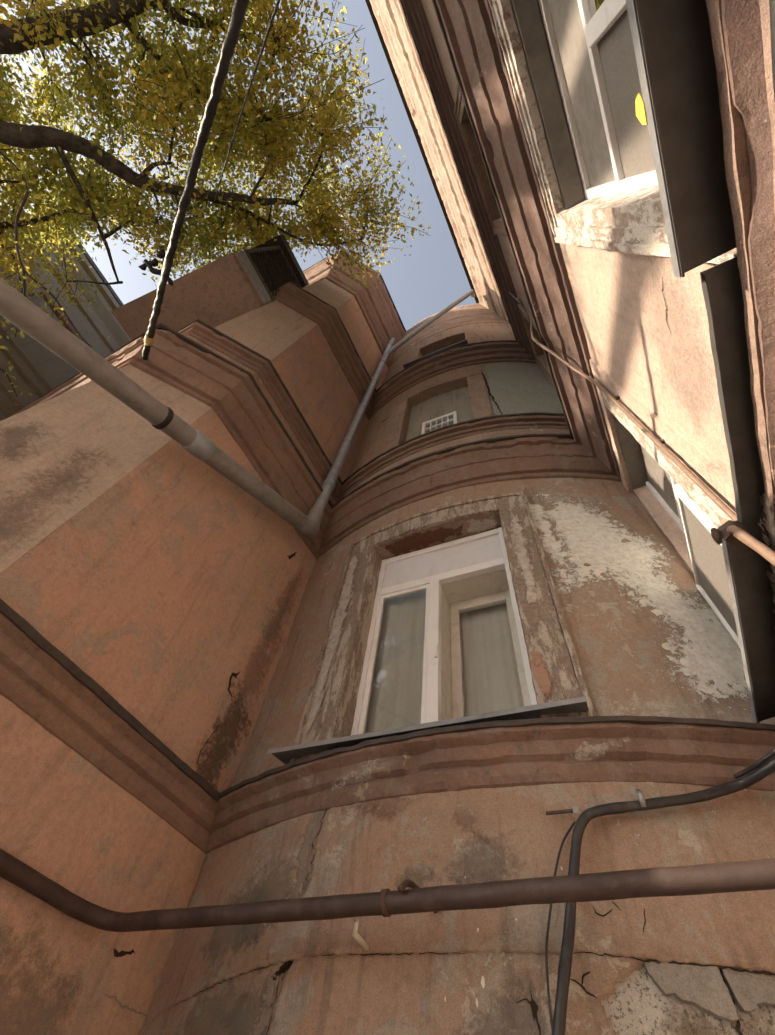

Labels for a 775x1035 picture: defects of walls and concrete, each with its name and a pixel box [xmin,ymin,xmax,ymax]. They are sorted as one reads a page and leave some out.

peeling [758,490,775,638]
peeling [385,487,752,716]
peeling [306,555,358,735]
crack [594,902,646,933]
crack [516,986,541,1035]
crack [570,971,598,999]
spalling [601,961,775,1035]